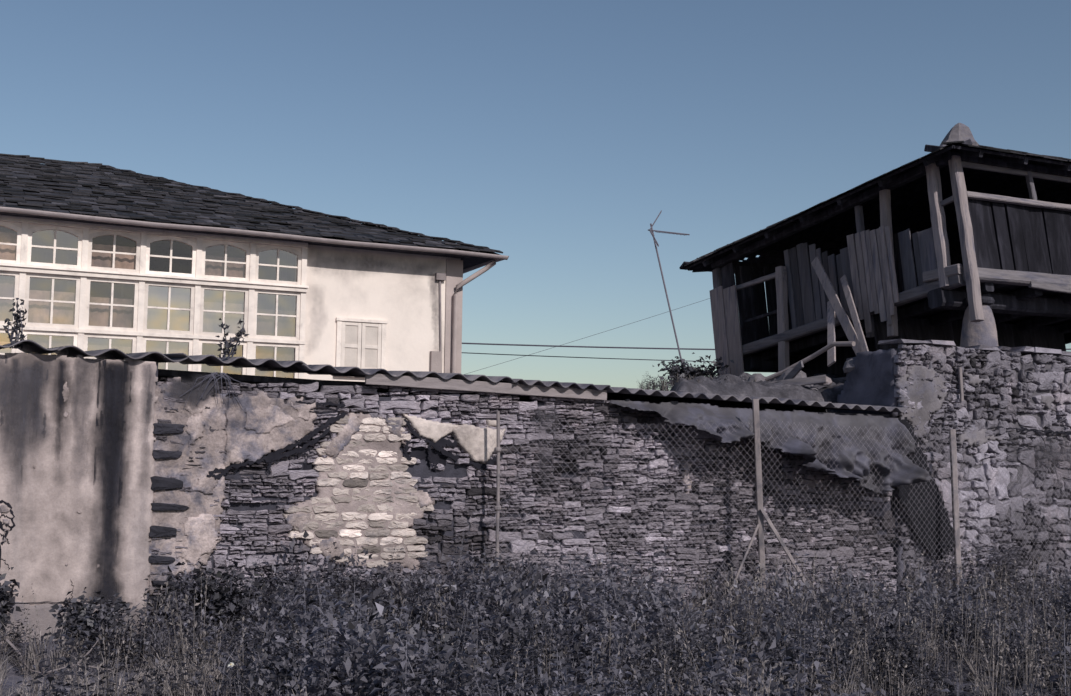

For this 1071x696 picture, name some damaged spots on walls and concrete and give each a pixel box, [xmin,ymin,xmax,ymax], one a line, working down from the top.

leakage [0,356,86,456]
leakage [92,359,131,606]
peeling [147,377,317,596]
spalling [282,412,505,574]
peeling [895,361,950,471]
peeling [962,372,990,386]